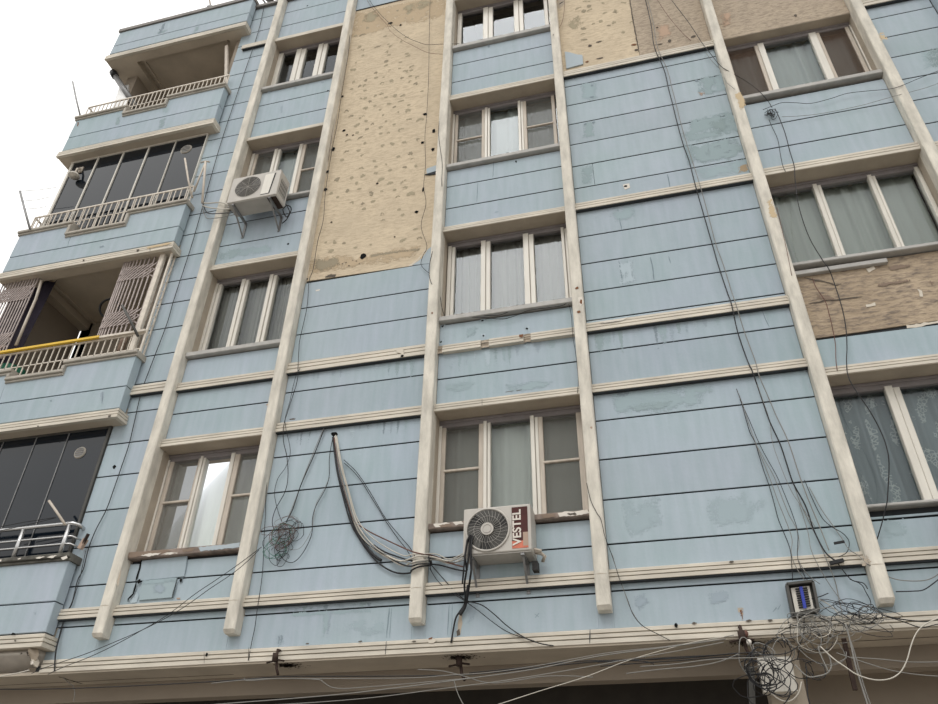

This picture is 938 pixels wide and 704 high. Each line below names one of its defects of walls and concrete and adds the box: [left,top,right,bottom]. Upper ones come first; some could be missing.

flaking render [557,0,711,72]
flaking render [712,0,850,39]
flaking render [307,0,446,291]
flaking render [797,251,938,339]